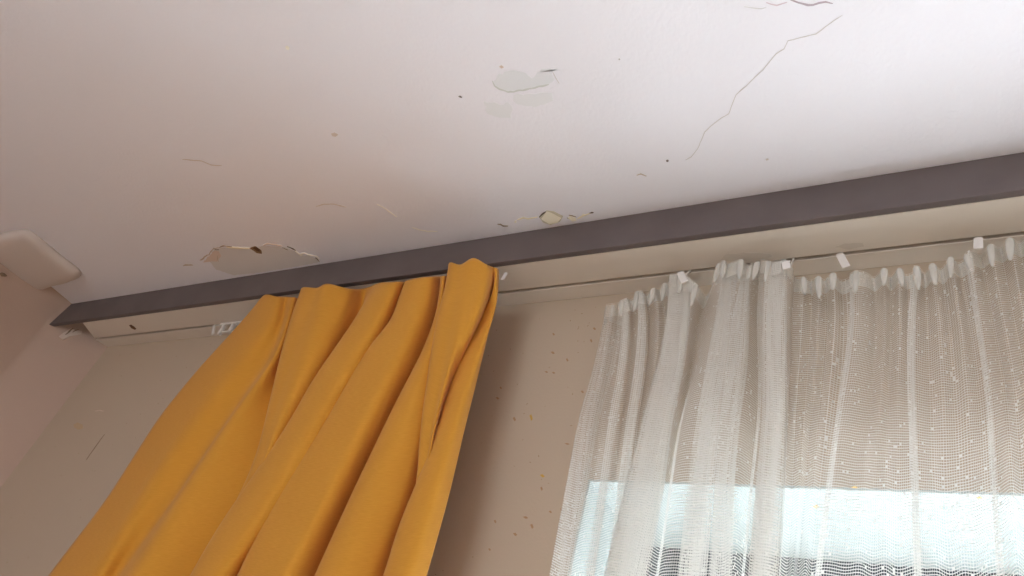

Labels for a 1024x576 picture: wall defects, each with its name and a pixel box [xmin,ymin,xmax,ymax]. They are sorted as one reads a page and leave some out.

crack [686,0,842,160]
peeling [517,210,590,225]
flaking render [204,246,319,275]